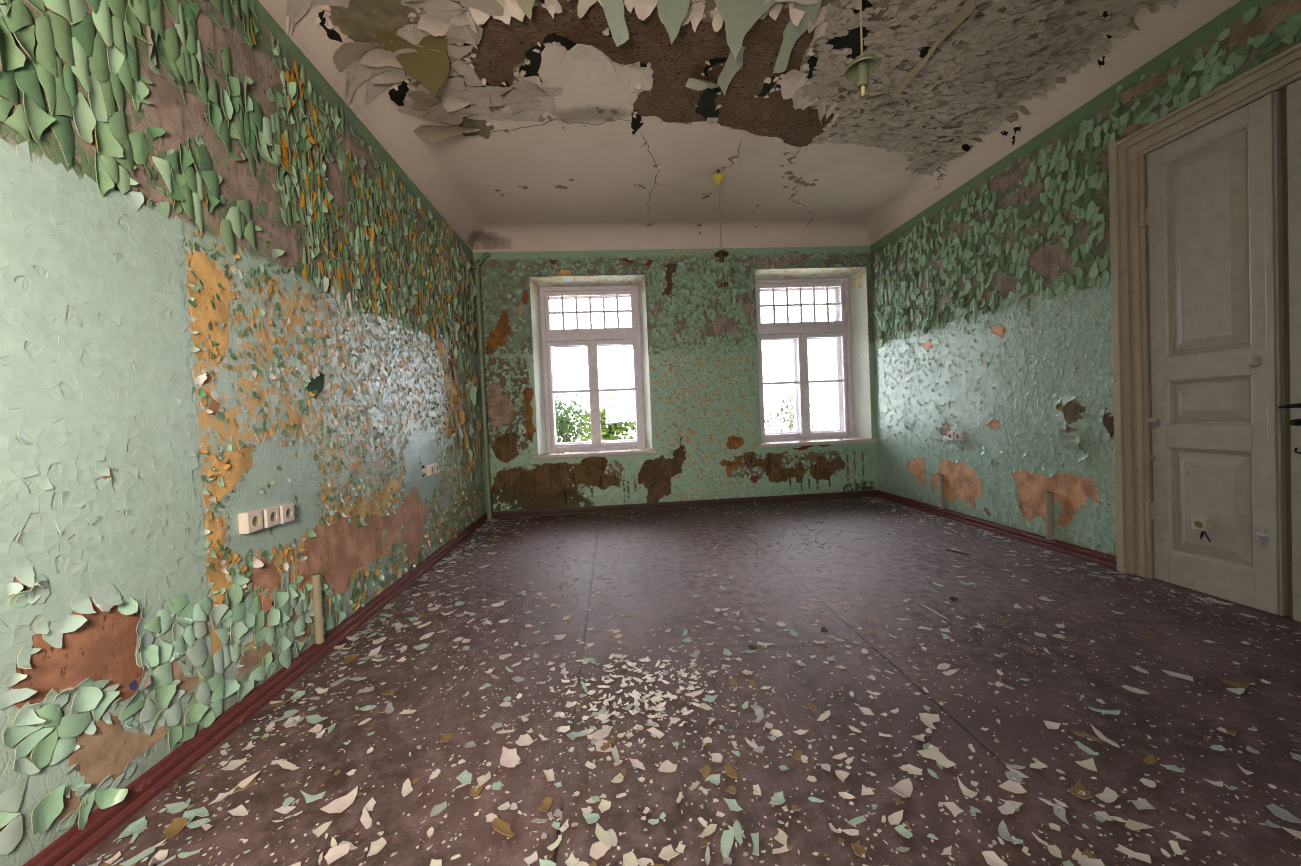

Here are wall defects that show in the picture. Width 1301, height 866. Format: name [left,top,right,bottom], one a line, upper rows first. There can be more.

peeling [0,0,875,856]
crack [465,117,664,216]
peeling [286,0,1180,177]
peeling [872,0,1301,518]